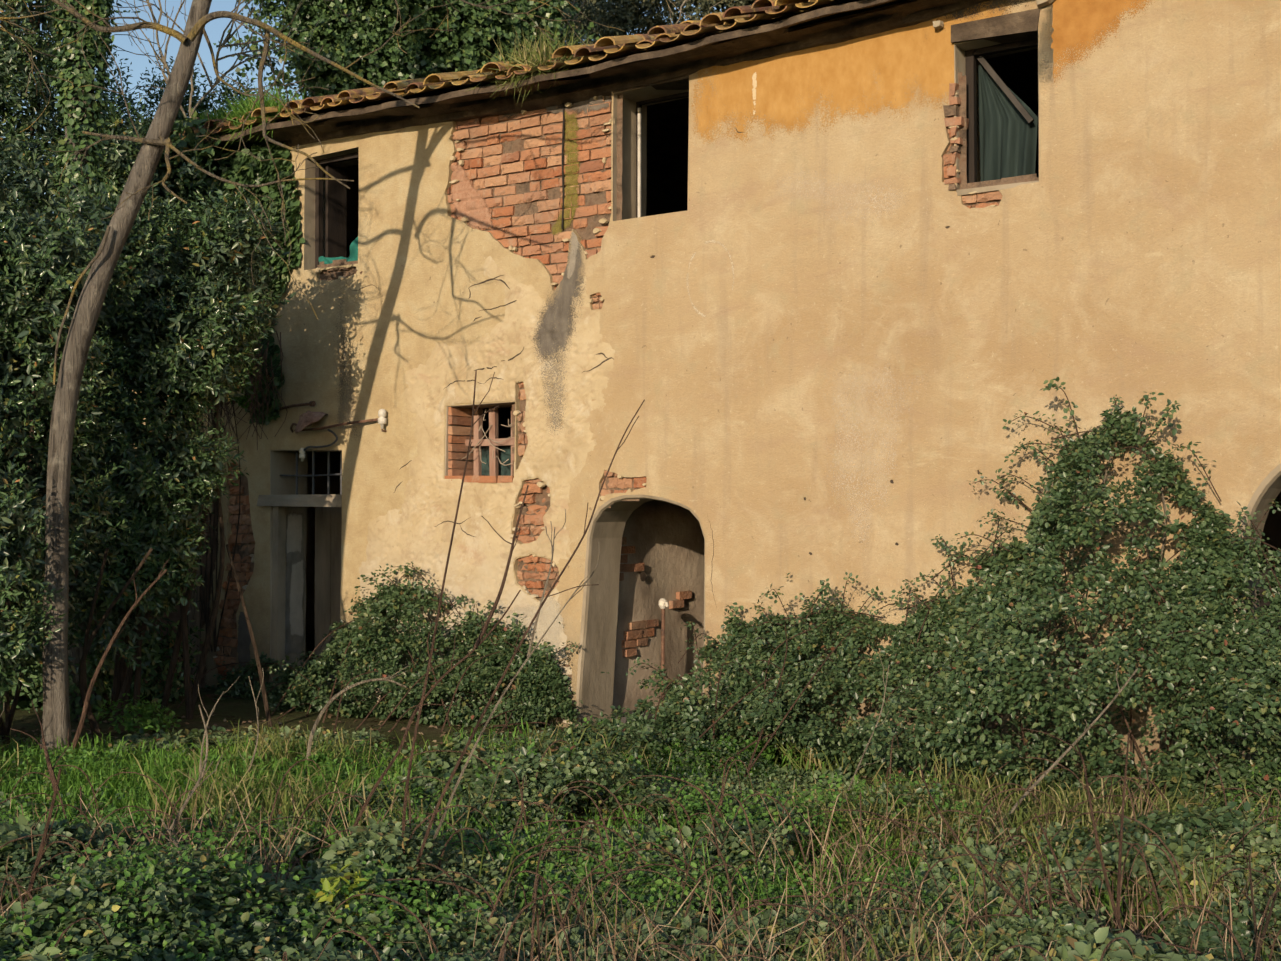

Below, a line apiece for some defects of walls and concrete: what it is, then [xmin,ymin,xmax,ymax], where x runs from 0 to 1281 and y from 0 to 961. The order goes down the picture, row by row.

water stain [688,0,1041,163]
spalling [943,72,1039,208]
flaking render [213,462,260,680]
flaking render [350,94,623,726]
water stain [531,232,586,439]
spalling [600,470,647,508]